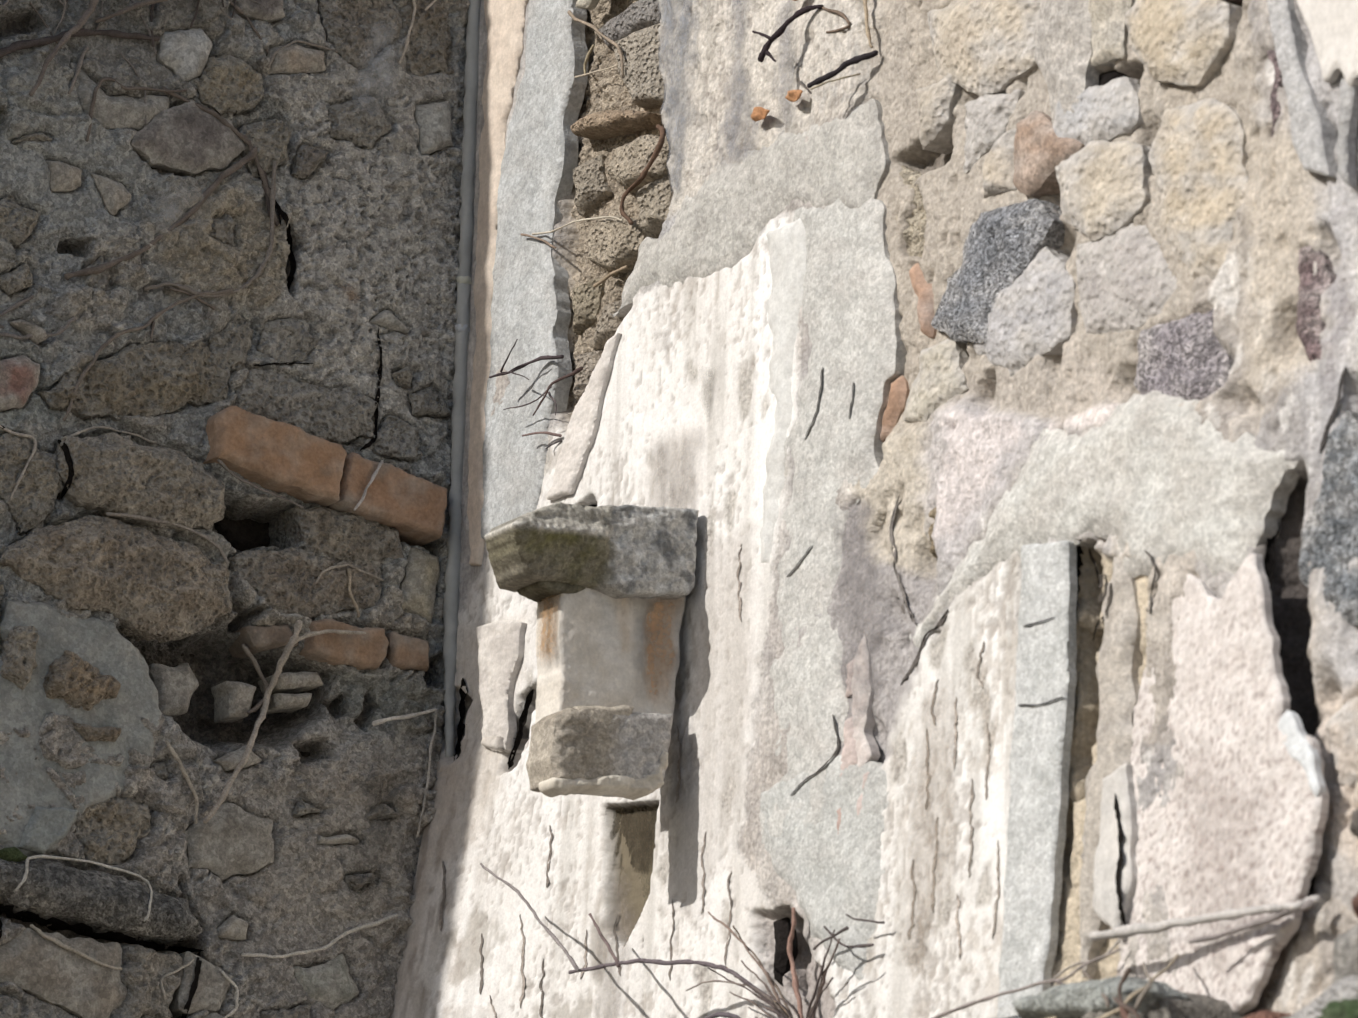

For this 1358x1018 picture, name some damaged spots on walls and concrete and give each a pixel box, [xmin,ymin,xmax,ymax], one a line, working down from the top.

peeling [1267,0,1358,188]
crack [257,167,296,289]
spalling [547,0,674,501]
crack [360,330,382,451]
crack [1023,539,1112,641]
crack [1263,517,1281,599]
peeling [476,620,527,752]
peeling [836,631,880,834]
peeling [968,722,990,876]
crack [1114,795,1126,925]
crack [0,904,204,1018]
peeling [519,915,544,1018]